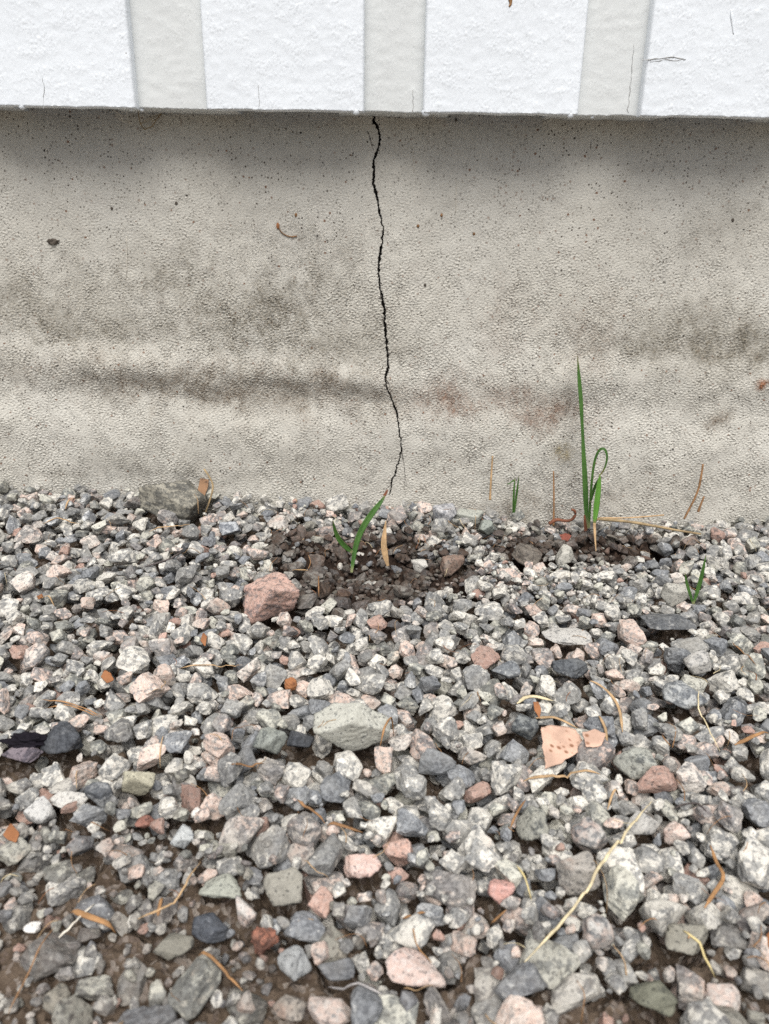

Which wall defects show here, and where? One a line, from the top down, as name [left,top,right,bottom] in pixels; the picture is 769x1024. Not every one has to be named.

crack [367,116,406,497]